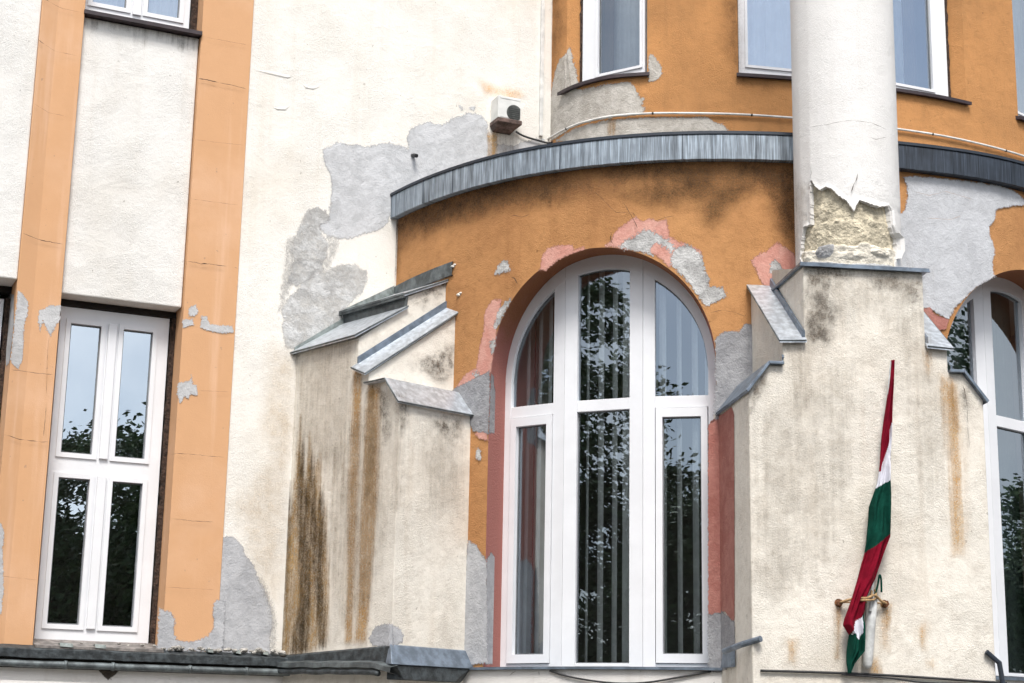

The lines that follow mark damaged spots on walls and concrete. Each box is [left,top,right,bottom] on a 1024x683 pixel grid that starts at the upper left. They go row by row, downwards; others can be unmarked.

peeling [605,216,703,268]
spalling [751,180,905,286]
peeling [0,291,61,369]
peeling [182,305,234,334]
peeling [456,298,511,387]
peeling [924,307,949,330]
peeling [176,377,198,403]
peeling [474,432,487,460]
water stain [282,432,328,653]
peeling [156,600,226,652]